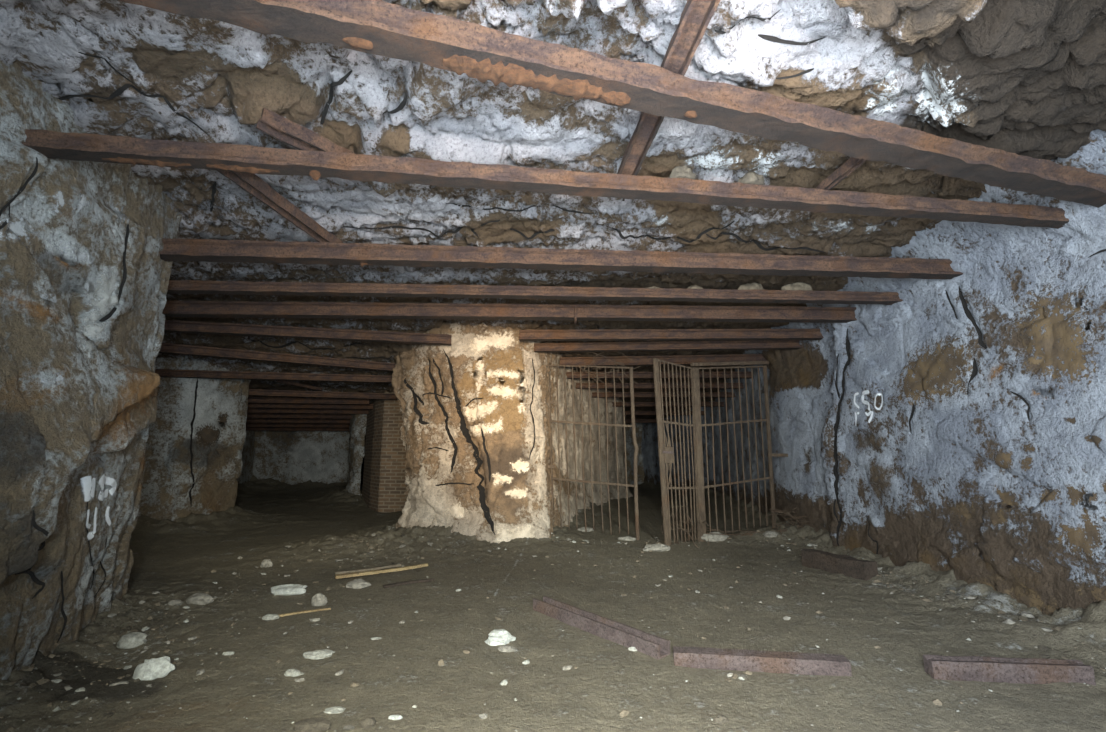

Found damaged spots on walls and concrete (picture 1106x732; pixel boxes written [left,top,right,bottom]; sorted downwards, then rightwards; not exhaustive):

crack [320,70,352,125]
crack [383,91,407,114]
crack [0,157,38,229]
crack [344,203,826,253]
crack [189,378,198,505]
crack [248,336,495,535]
crack [528,358,536,460]
crack [833,328,878,554]
crack [15,510,67,643]
crack [86,501,107,598]